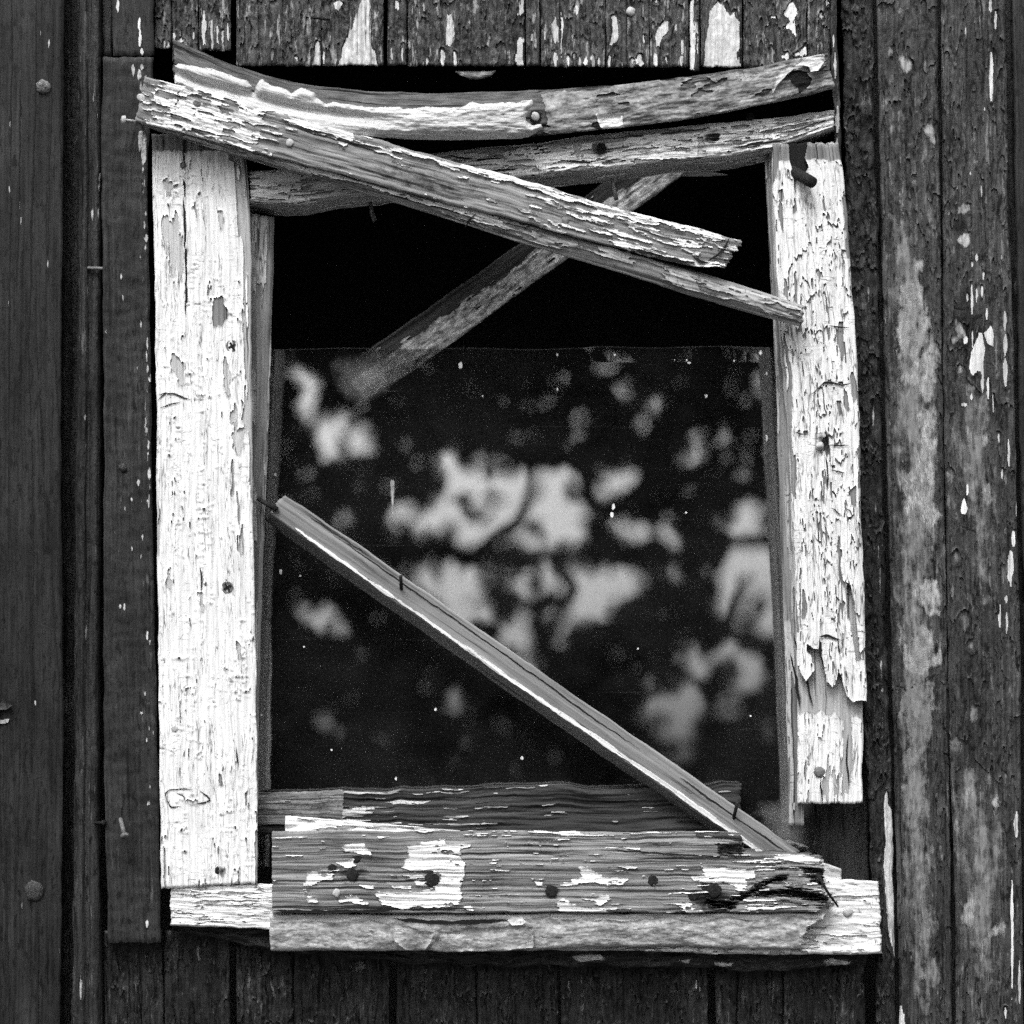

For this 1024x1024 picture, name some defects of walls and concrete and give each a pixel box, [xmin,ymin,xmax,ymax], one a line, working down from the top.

peeling [339,0,378,66]
peeling [544,5,618,67]
peeling [631,0,741,70]
peeling [771,3,797,36]
peeling [772,35,836,94]
crack [810,381,851,395]
peeling [952,234,1010,579]
crack [794,429,853,517]
peeling [884,219,949,1015]
peeling [983,531,1015,634]
spalling [706,867,829,911]
peeling [954,769,1021,1004]